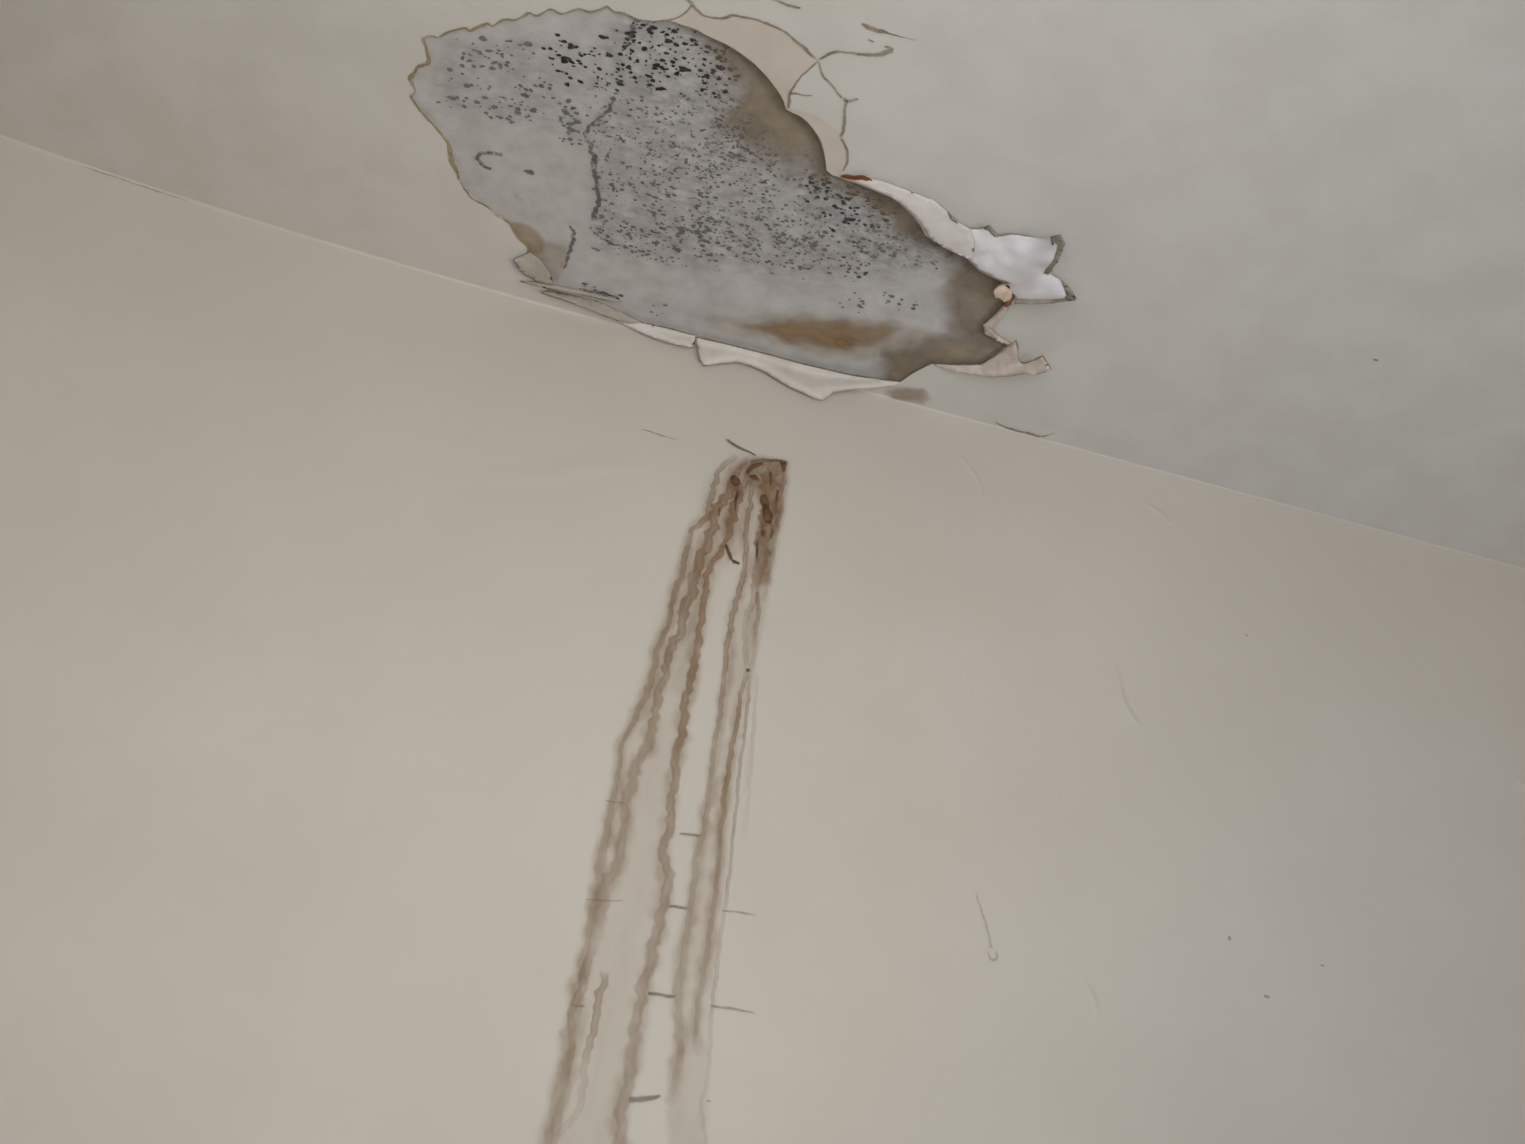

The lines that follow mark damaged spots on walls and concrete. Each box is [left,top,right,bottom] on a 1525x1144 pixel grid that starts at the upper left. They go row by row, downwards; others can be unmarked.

water stain [436,21,1007,381]
peeling [408,6,1077,400]
crack [667,1,913,170]
water stain [682,462,786,642]